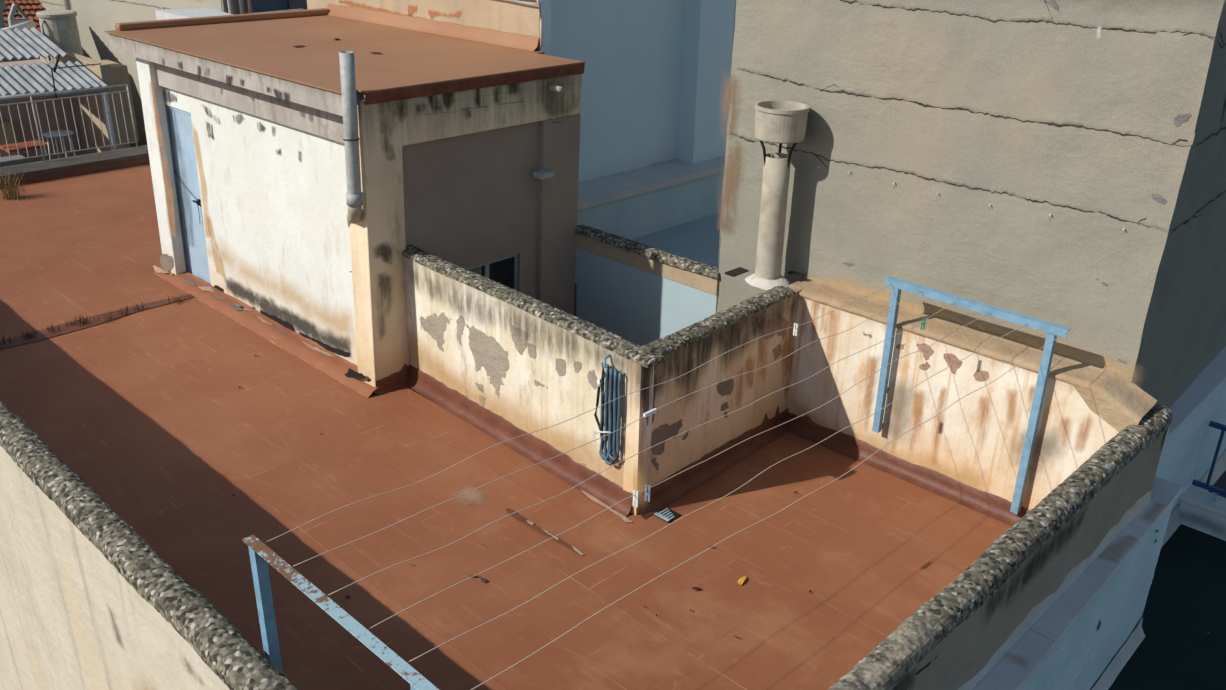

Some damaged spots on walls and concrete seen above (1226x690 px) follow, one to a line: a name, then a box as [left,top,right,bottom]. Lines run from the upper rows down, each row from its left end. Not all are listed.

crack [840,0,1226,48]
crack [736,60,1226,148]
crack [726,125,1226,233]
damp [226,281,350,352]
peeling [420,312,536,406]
peeling [555,358,598,390]
corrosion [865,359,876,408]
peeling [896,343,962,374]
peeling [973,370,989,382]
peeling [641,364,689,470]
corrosion [914,396,922,425]